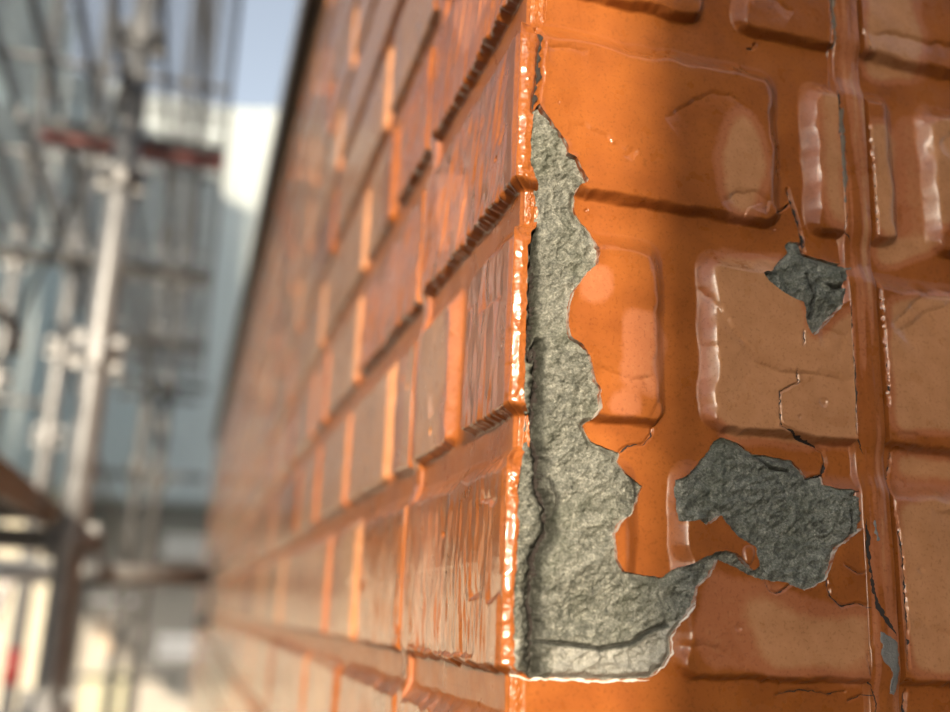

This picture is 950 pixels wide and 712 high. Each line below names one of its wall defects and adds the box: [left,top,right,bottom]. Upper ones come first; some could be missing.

crack [777,190,805,251]
spalling [509,107,861,683]
crack [779,371,825,479]